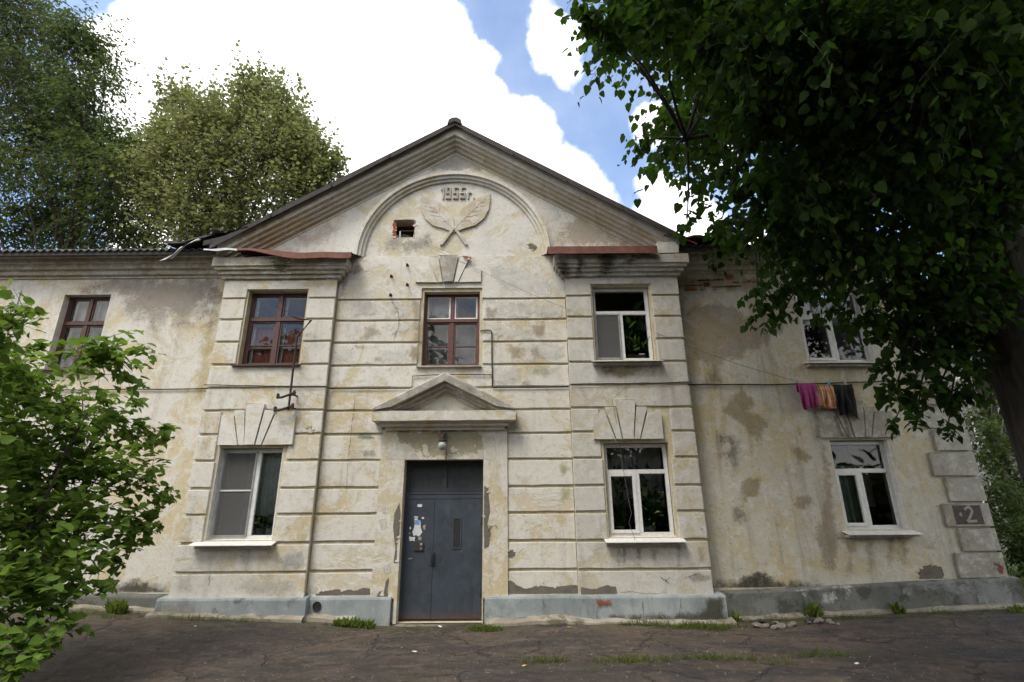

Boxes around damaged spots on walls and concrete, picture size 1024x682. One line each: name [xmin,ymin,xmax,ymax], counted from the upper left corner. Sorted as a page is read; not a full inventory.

flaking render [483,485,491,549]
flaking render [306,503,402,597]
flaking render [508,580,617,594]
flaking render [917,563,944,579]